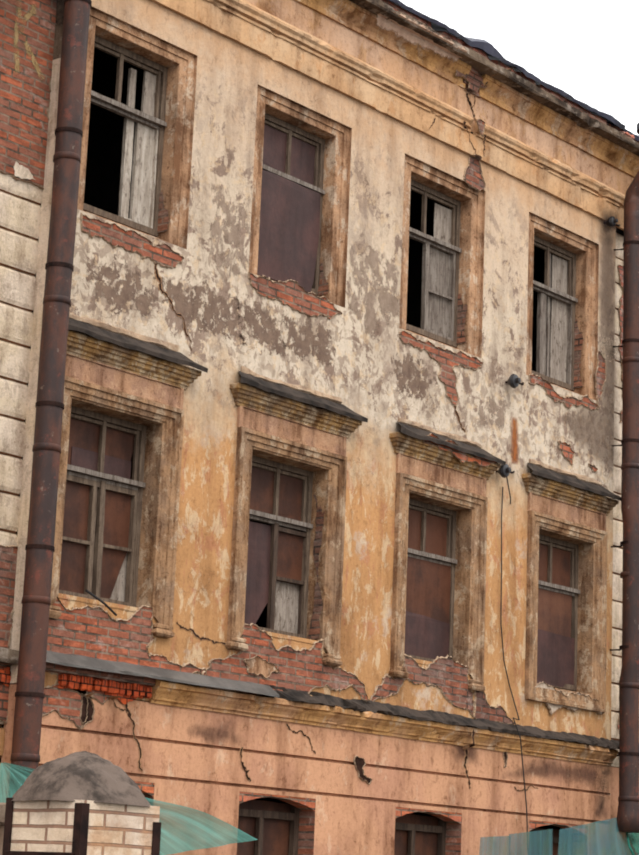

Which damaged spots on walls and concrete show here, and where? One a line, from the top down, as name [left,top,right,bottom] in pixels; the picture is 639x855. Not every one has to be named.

flaking render [0,0,57,189]
crack [463,67,516,154]
crack [154,264,192,351]
peeling [80,186,399,366]
flaking render [391,330,483,406]
flaking render [0,545,19,649]
flaking render [0,663,12,723]
crack [86,693,143,771]
crack [240,747,251,782]
flaking render [42,597,515,730]
crack [286,724,316,754]